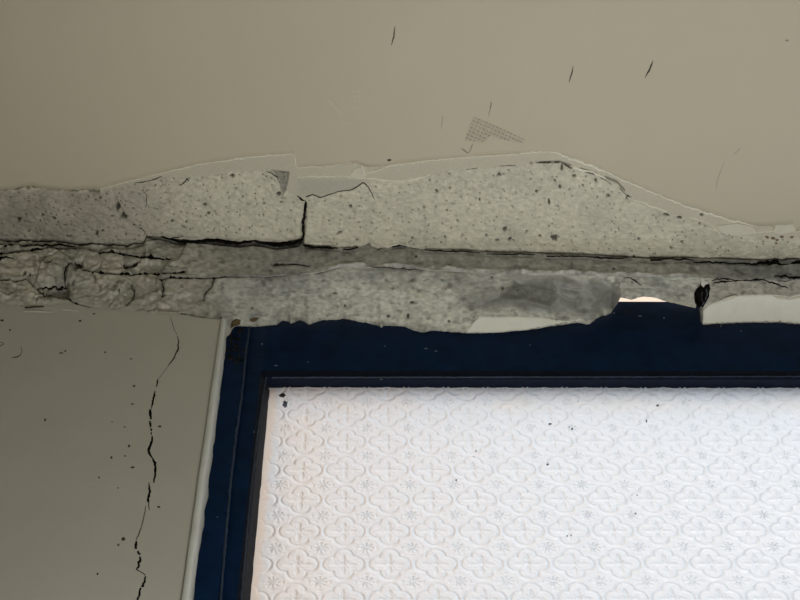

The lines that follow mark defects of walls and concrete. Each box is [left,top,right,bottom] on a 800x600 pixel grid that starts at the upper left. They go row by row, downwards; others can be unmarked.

crack [0,182,375,305]
flaking render [0,136,800,364]
crack [425,249,628,259]
crack [135,313,186,600]